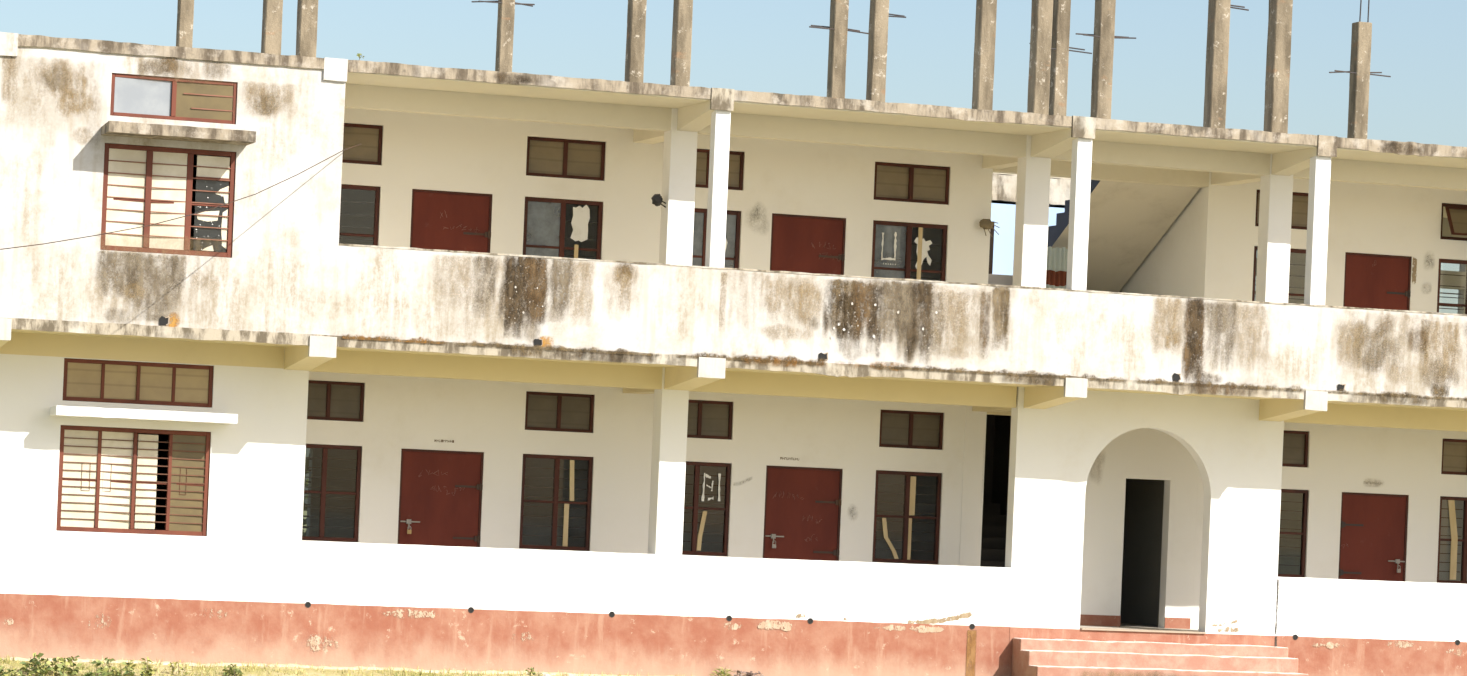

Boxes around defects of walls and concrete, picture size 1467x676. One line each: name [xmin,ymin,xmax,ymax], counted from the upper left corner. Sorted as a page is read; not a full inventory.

damp [45,68,90,112]
damp [99,251,186,316]
damp [477,256,589,332]
damp [777,279,942,360]
damp [981,287,1009,348]
damp [1155,298,1236,382]
damp [1410,322,1458,396]